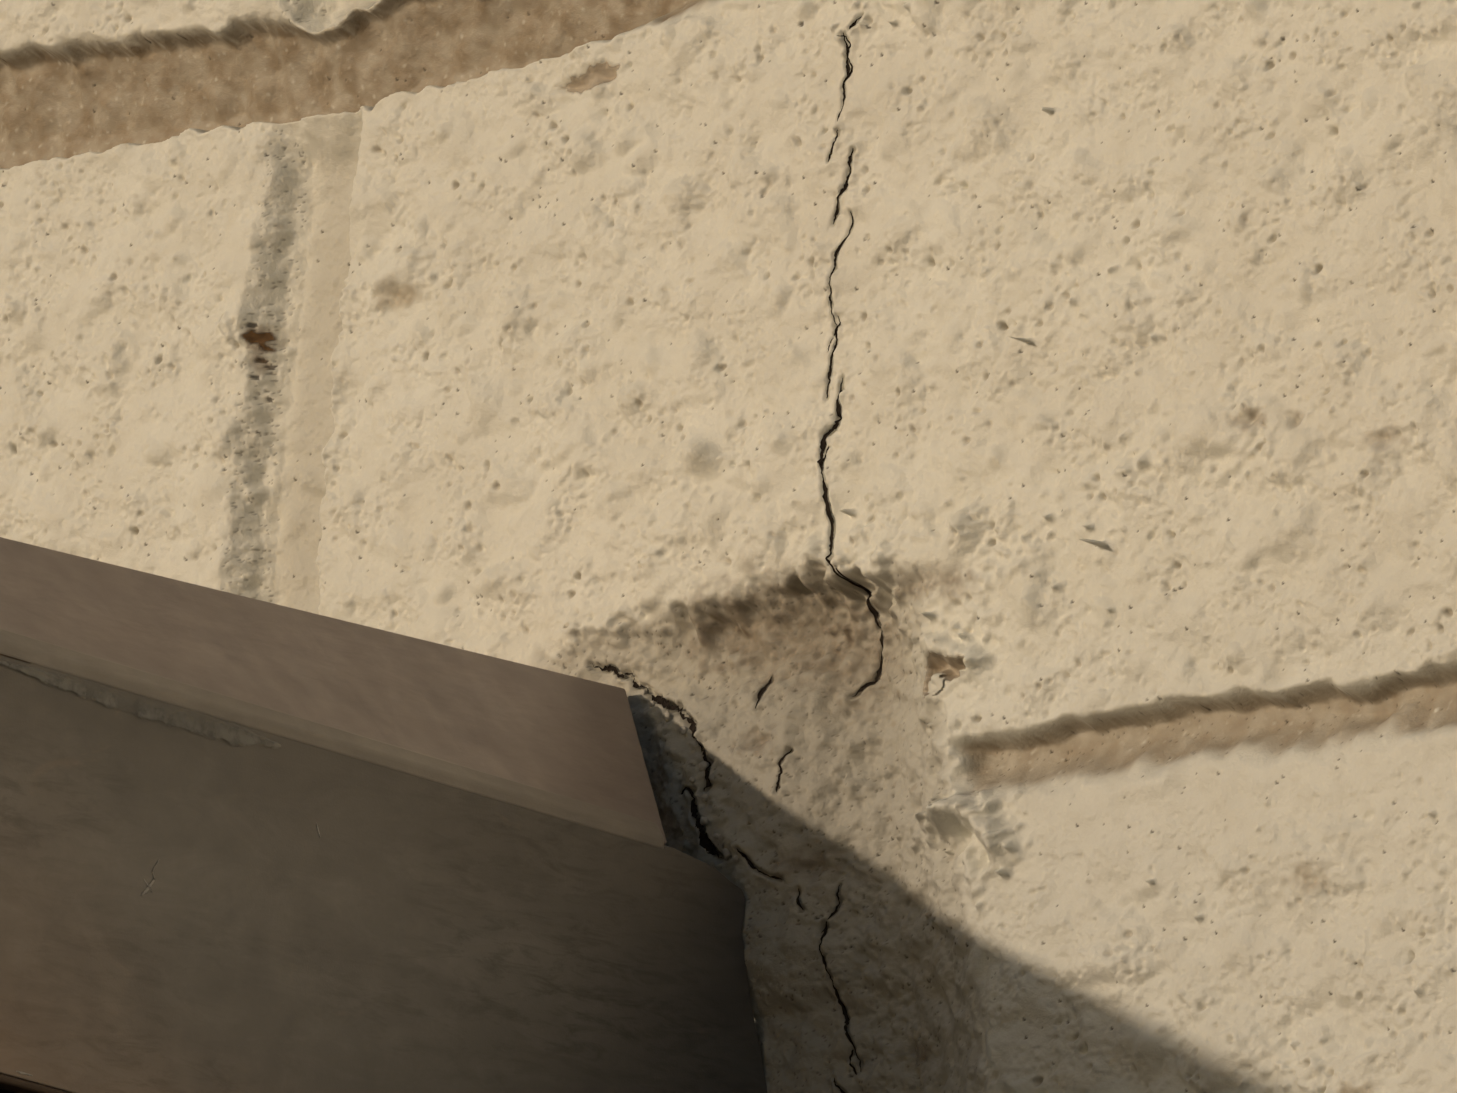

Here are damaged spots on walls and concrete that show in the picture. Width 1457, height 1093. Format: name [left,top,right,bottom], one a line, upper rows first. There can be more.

crack [817,17,883,697]
crack [591,663,861,1093]